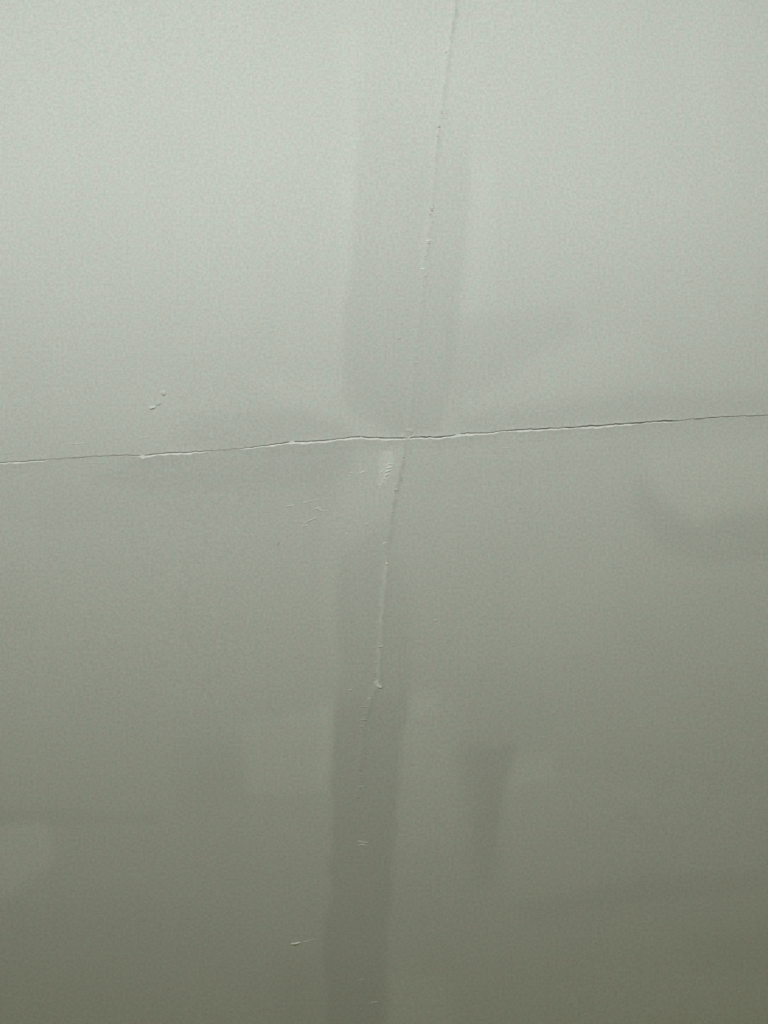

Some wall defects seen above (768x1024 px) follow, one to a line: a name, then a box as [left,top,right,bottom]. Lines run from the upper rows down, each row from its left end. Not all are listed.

crack [0,409,768,473]